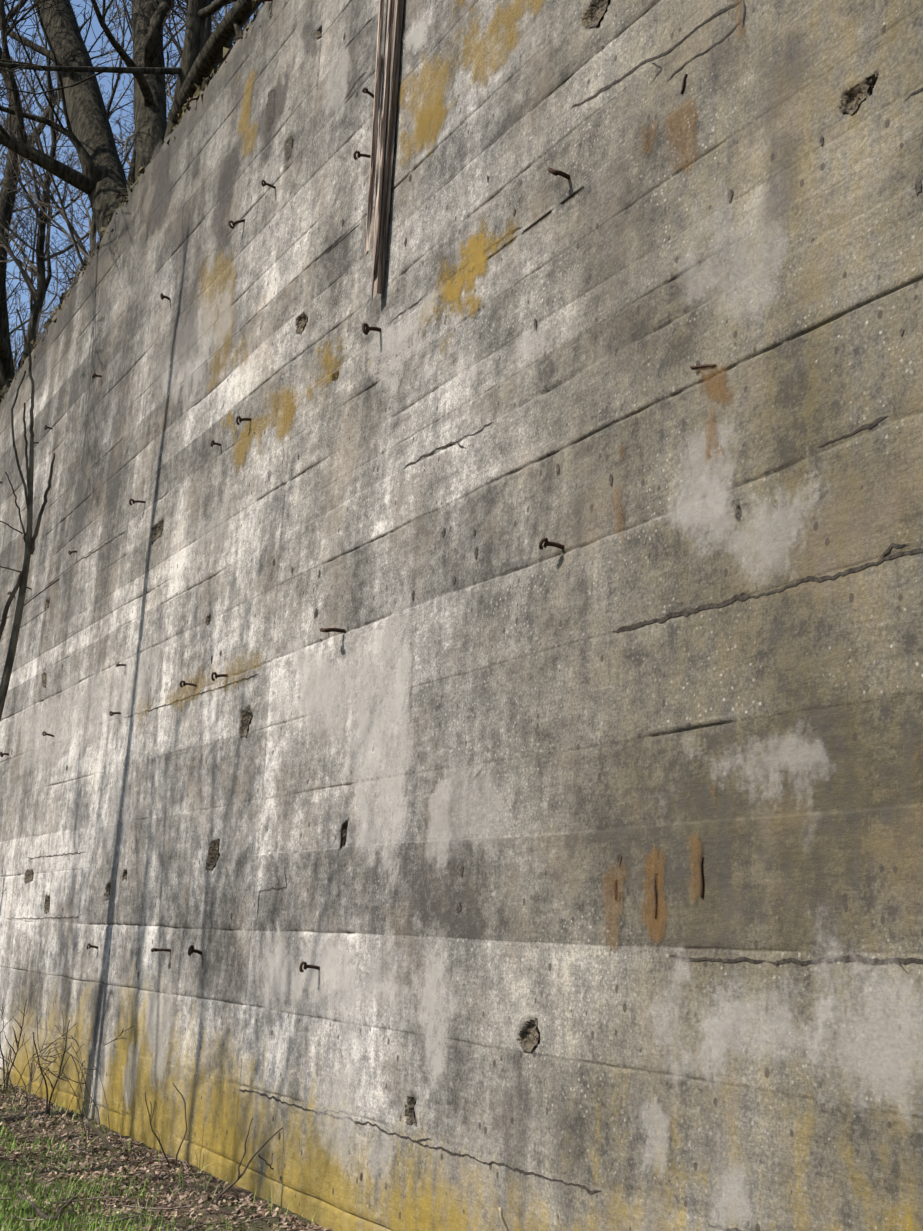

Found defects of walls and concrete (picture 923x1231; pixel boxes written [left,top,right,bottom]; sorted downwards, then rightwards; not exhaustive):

water stain [407,22,426,50]
crack [572,0,745,107]
crack [670,954,923,973]
spalling [517,1018,540,1052]
crack [238,1089,600,1194]
crack [709,1223,742,1231]